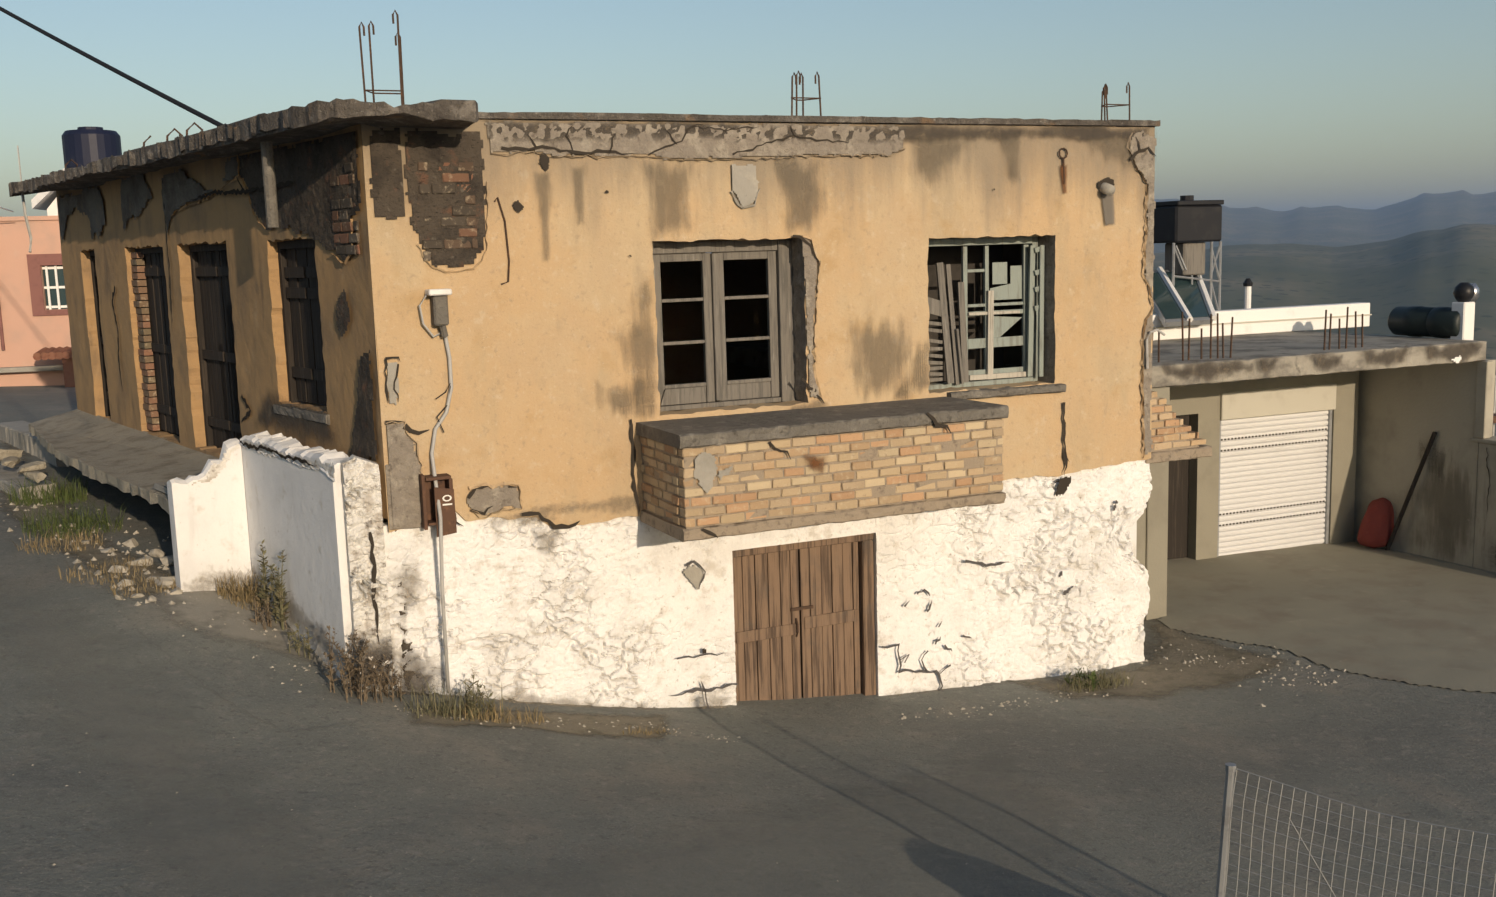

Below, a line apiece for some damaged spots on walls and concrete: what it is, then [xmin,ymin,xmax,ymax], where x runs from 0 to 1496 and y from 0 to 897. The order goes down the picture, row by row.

spalling [143,122,203,146]
flaking render [58,131,361,265]
flaking render [404,70,905,273]
flaking render [1126,82,1206,458]
flaking render [336,289,350,336]
flaking render [803,235,823,398]
flaking render [192,440,335,485]
flaking render [349,350,424,528]
flaking render [467,481,523,518]
crack [672,653,738,709]
crack [881,643,951,691]